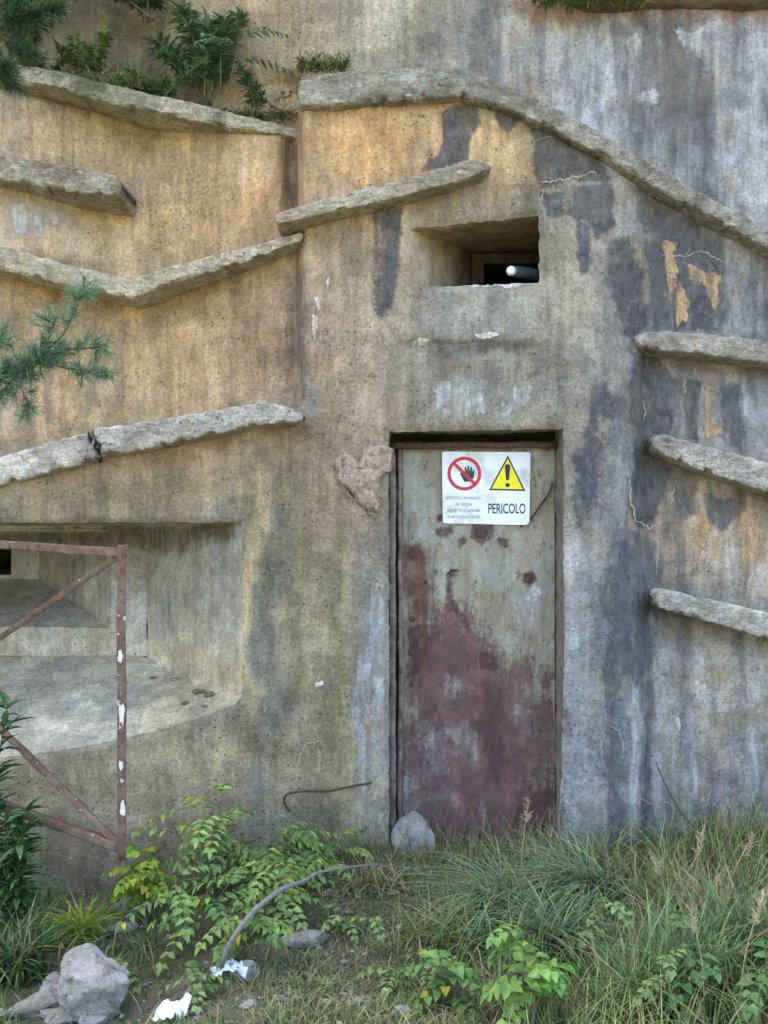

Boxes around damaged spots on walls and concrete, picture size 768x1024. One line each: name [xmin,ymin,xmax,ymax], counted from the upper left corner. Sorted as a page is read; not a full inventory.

leakage [642,21,704,161]
crack [534,171,602,213]
leakage [373,208,402,317]
crack [662,248,727,273]
peeling [662,240,738,327]
leakage [721,384,742,447]
leakage [423,104,733,847]
crack [618,459,675,577]
leakage [706,494,741,570]
corrosion [382,544,565,840]